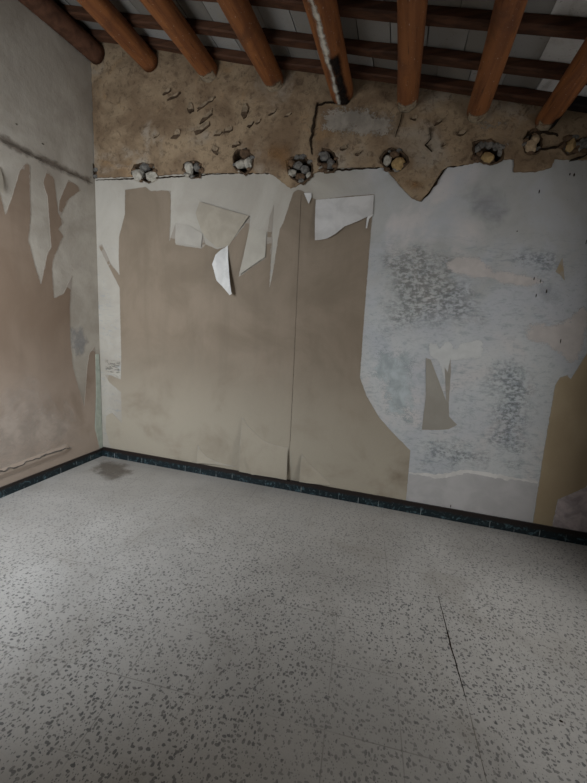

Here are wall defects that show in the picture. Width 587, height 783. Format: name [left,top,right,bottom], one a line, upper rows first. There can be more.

flaking render [91,42,587,202]
crack [435,596,466,698]